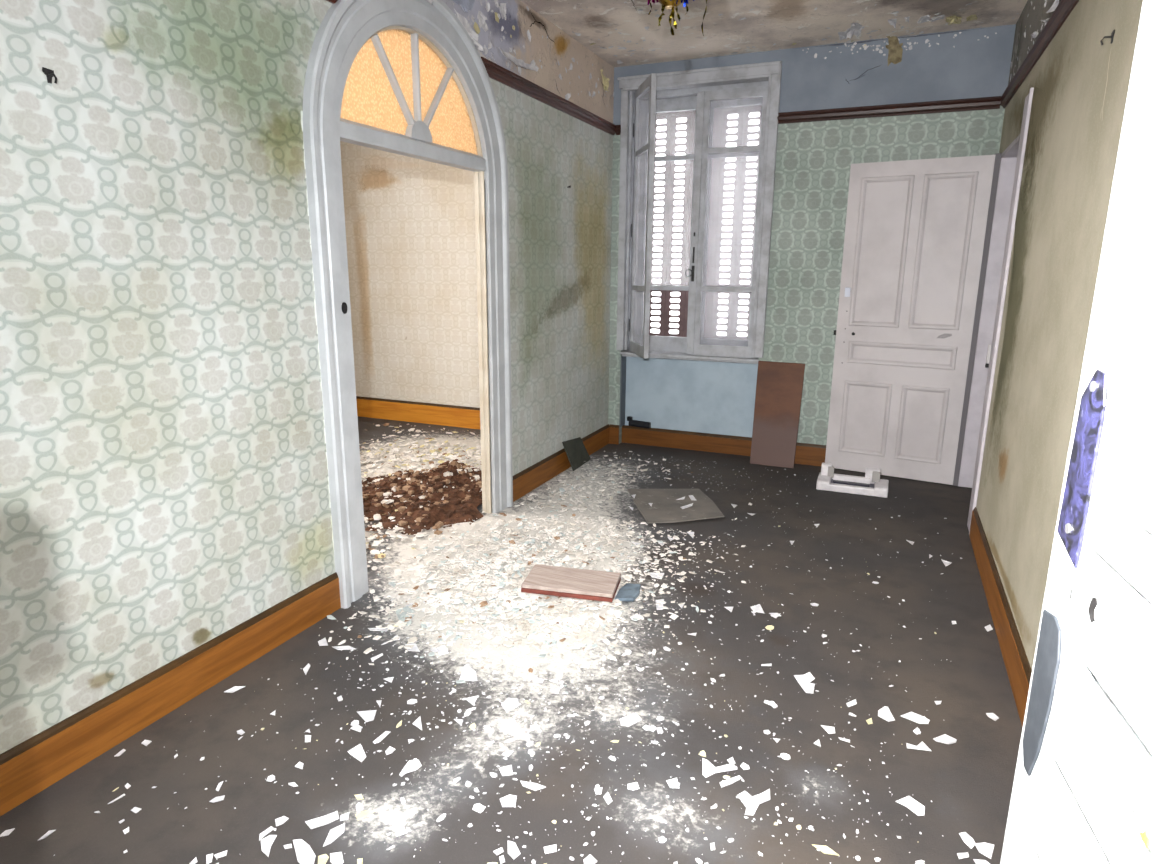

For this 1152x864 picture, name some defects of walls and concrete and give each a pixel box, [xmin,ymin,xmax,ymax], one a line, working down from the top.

peeling [452,0,548,75]
peeling [1010,0,1059,81]